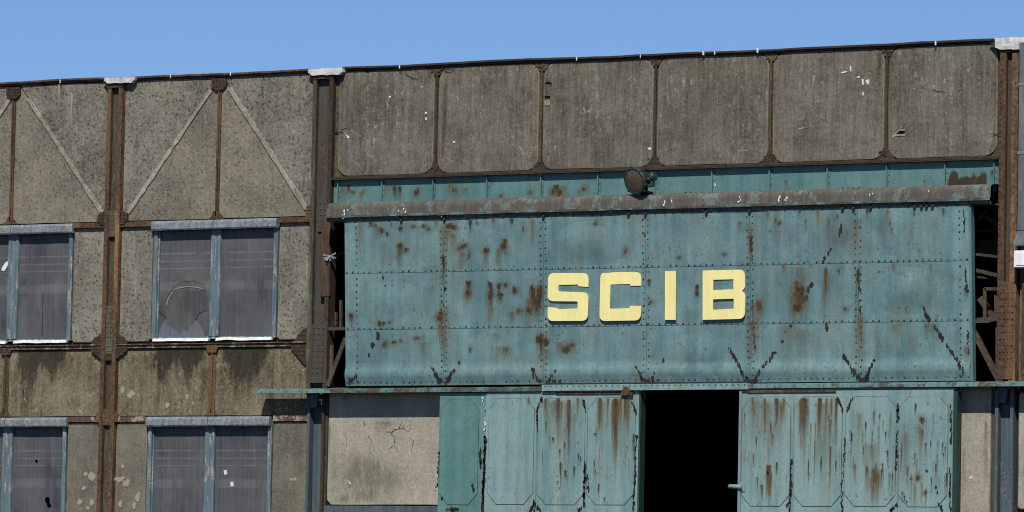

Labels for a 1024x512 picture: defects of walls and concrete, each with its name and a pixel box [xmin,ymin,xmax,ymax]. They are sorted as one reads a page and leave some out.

corrosion [488,282,542,314]
water stain [18,349,64,398]
water stain [150,347,206,380]
water stain [222,347,269,388]
crack [345,421,415,457]
corrosion [544,398,581,484]
corrosion [594,398,629,442]
corrosion [799,397,838,479]
corrosion [901,403,947,495]
peeling [76,471,96,510]
peeling [114,464,141,510]
corrosion [757,462,778,496]